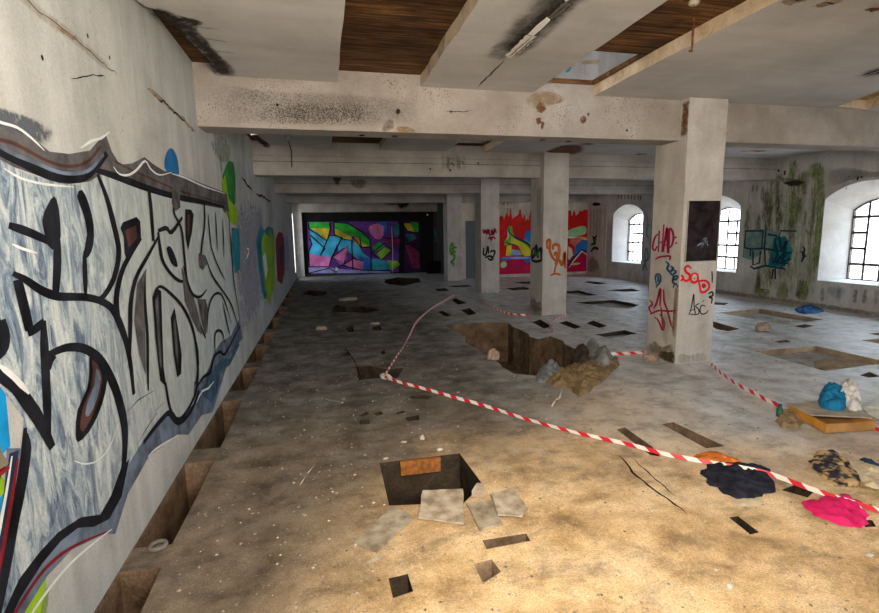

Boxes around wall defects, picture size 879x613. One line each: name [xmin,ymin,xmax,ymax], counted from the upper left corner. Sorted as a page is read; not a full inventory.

crack [28,0,118,79]
spalling [781,0,844,8]
corrosion [535,92,561,129]
leakage [765,161,825,291]